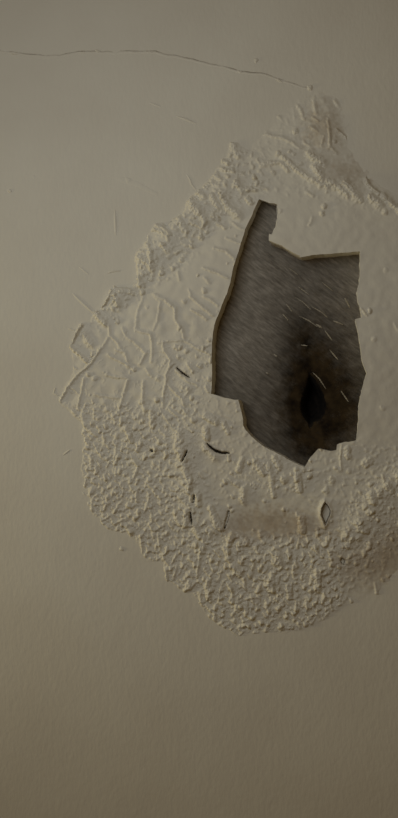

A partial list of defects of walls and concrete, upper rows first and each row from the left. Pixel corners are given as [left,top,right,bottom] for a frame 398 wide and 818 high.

peeling [89,85,398,467]
flaking render [71,413,398,636]